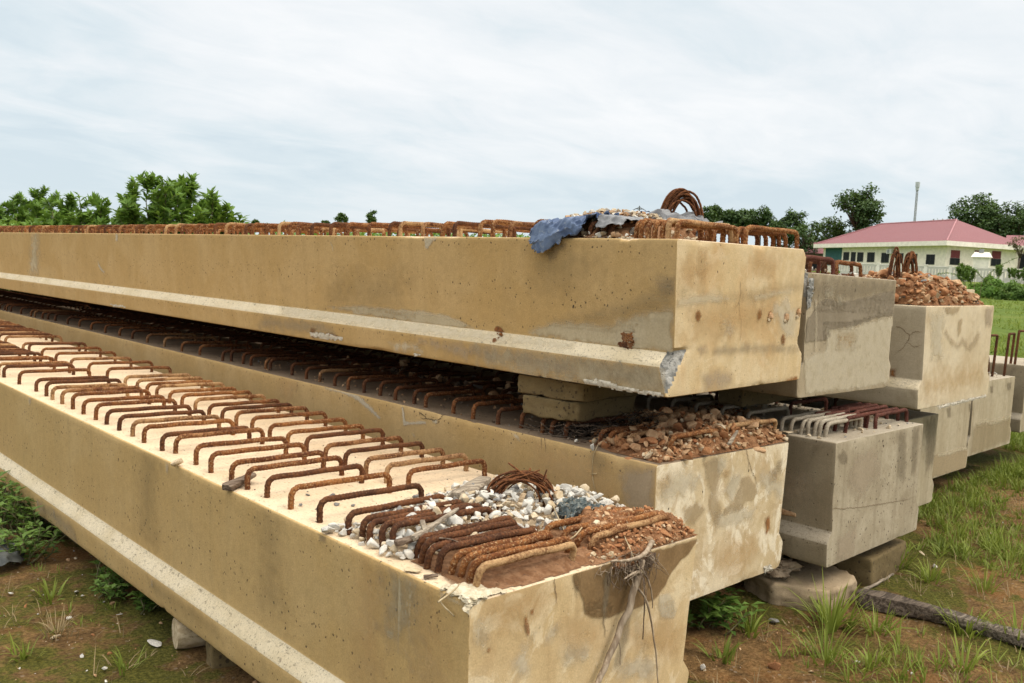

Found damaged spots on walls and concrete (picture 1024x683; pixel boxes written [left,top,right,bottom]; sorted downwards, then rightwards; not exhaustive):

corrosion [617,328,635,350]
spalling [583,349,686,397]
spalling [440,582,507,614]